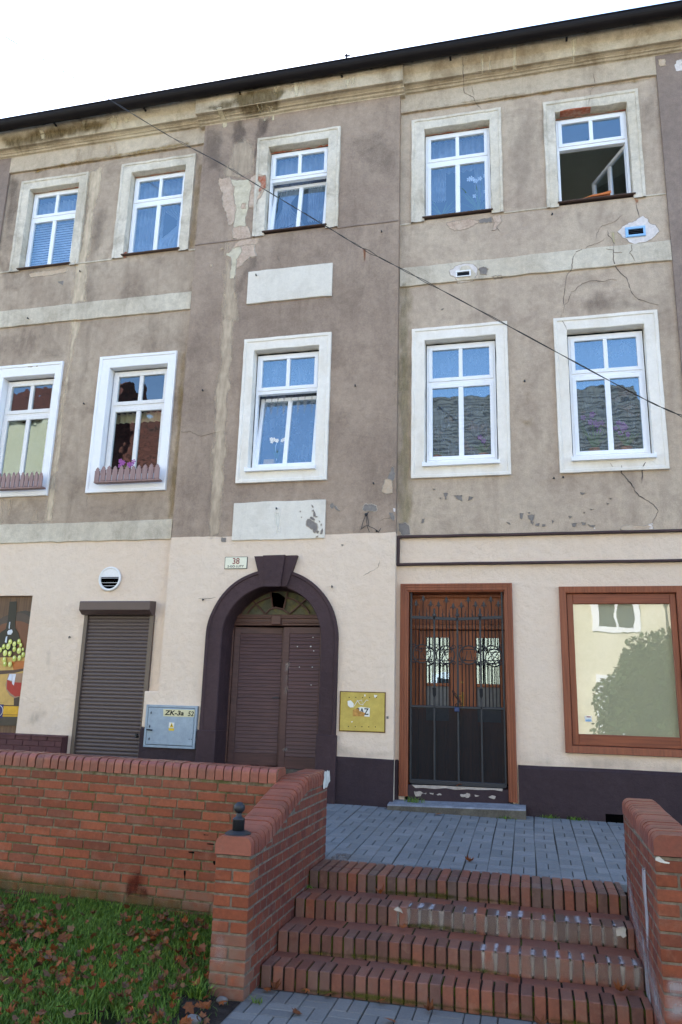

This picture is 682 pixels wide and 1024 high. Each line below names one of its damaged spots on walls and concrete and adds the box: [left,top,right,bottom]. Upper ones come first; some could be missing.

flaking render [218,174,268,279]
crack [562,205,657,327]
peeling [300,505,323,538]
peeling [506,512,554,527]
crack [610,462,658,520]